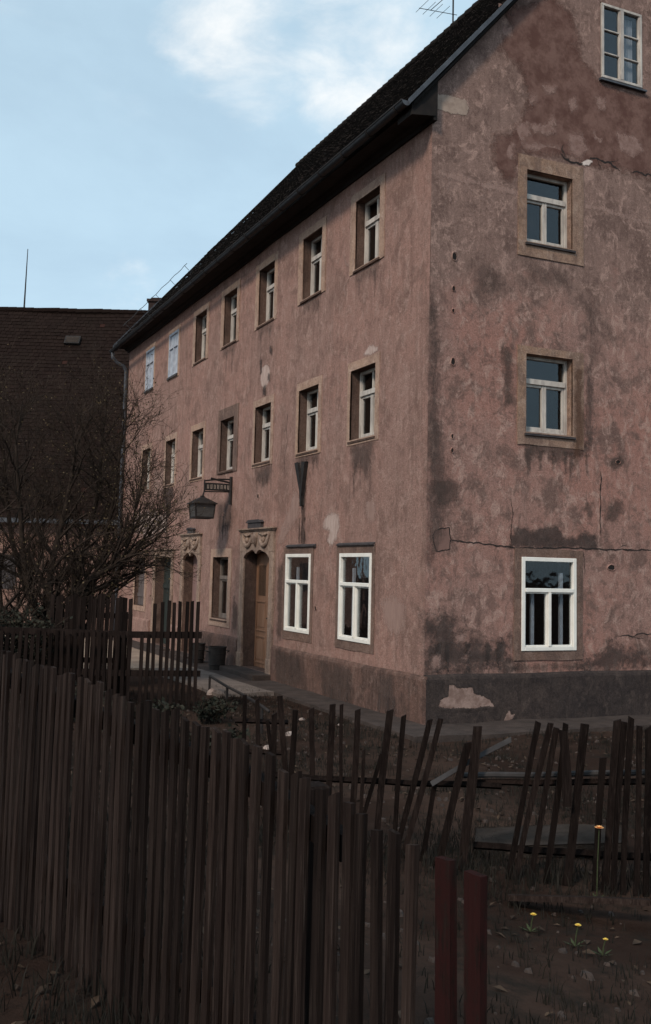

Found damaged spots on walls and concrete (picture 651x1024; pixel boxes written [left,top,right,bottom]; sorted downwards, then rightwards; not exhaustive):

crack [560,146,651,176]
flaking render [323,504,340,555]
crack [433,476,648,568]
water stain [509,527,596,549]
spalling [435,678,518,721]